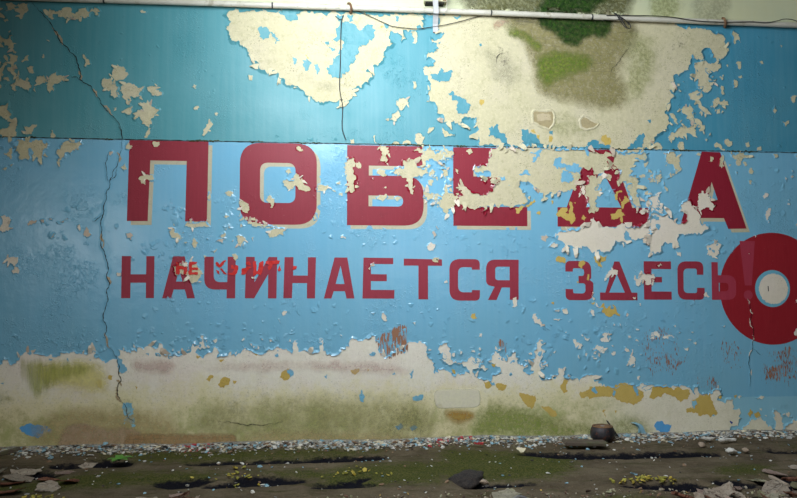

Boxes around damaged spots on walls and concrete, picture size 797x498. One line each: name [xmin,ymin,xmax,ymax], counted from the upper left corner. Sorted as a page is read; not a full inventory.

peeling [43,6,102,23]
leakage [466,0,634,107]
peeling [0,100,84,167]
peeling [100,64,164,148]
peeling [222,6,762,307]
crack [375,143,757,153]
crack [0,1,355,427]
peeling [168,190,287,285]
rust [376,324,408,359]
peeling [0,291,797,490]
crack [747,299,761,386]
rust [760,343,797,389]